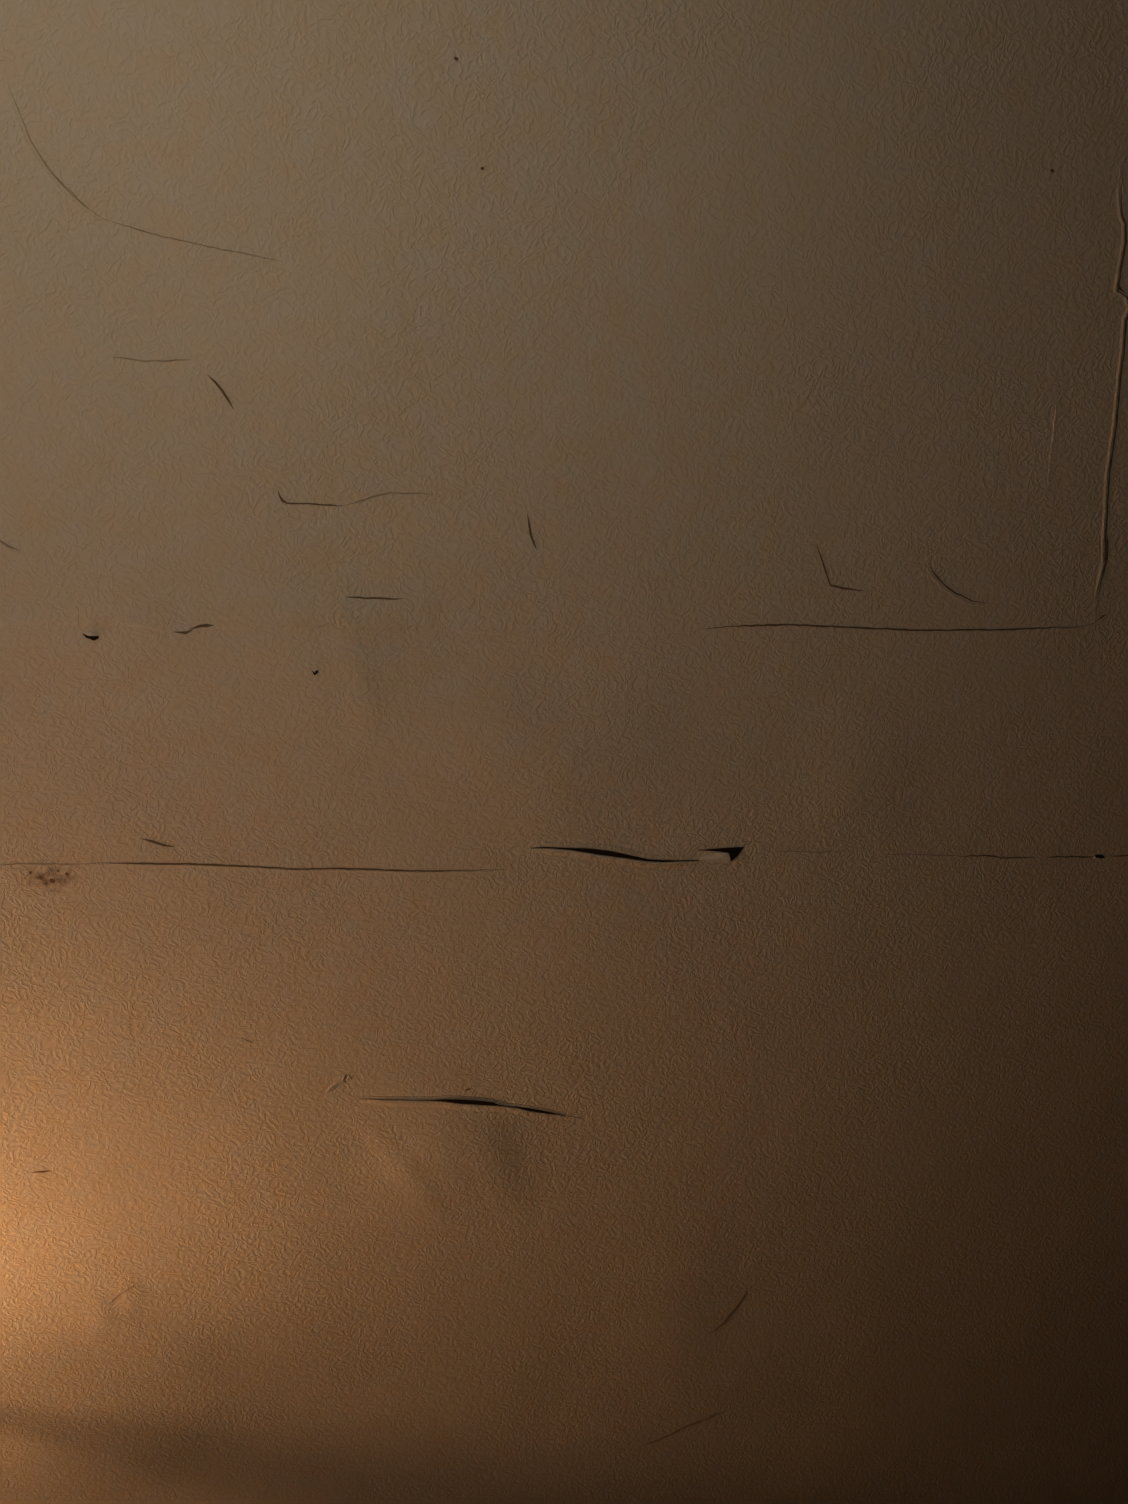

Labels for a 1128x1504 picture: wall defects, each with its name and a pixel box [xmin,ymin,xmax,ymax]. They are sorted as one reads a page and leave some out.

crack [8,85,102,218]
crack [115,357,233,408]
crack [1093,150,1128,632]
crack [278,491,432,506]
crack [527,514,537,550]
crack [817,545,862,591]
crack [349,594,397,602]
crack [1,839,506,875]
crack [887,852,1128,860]